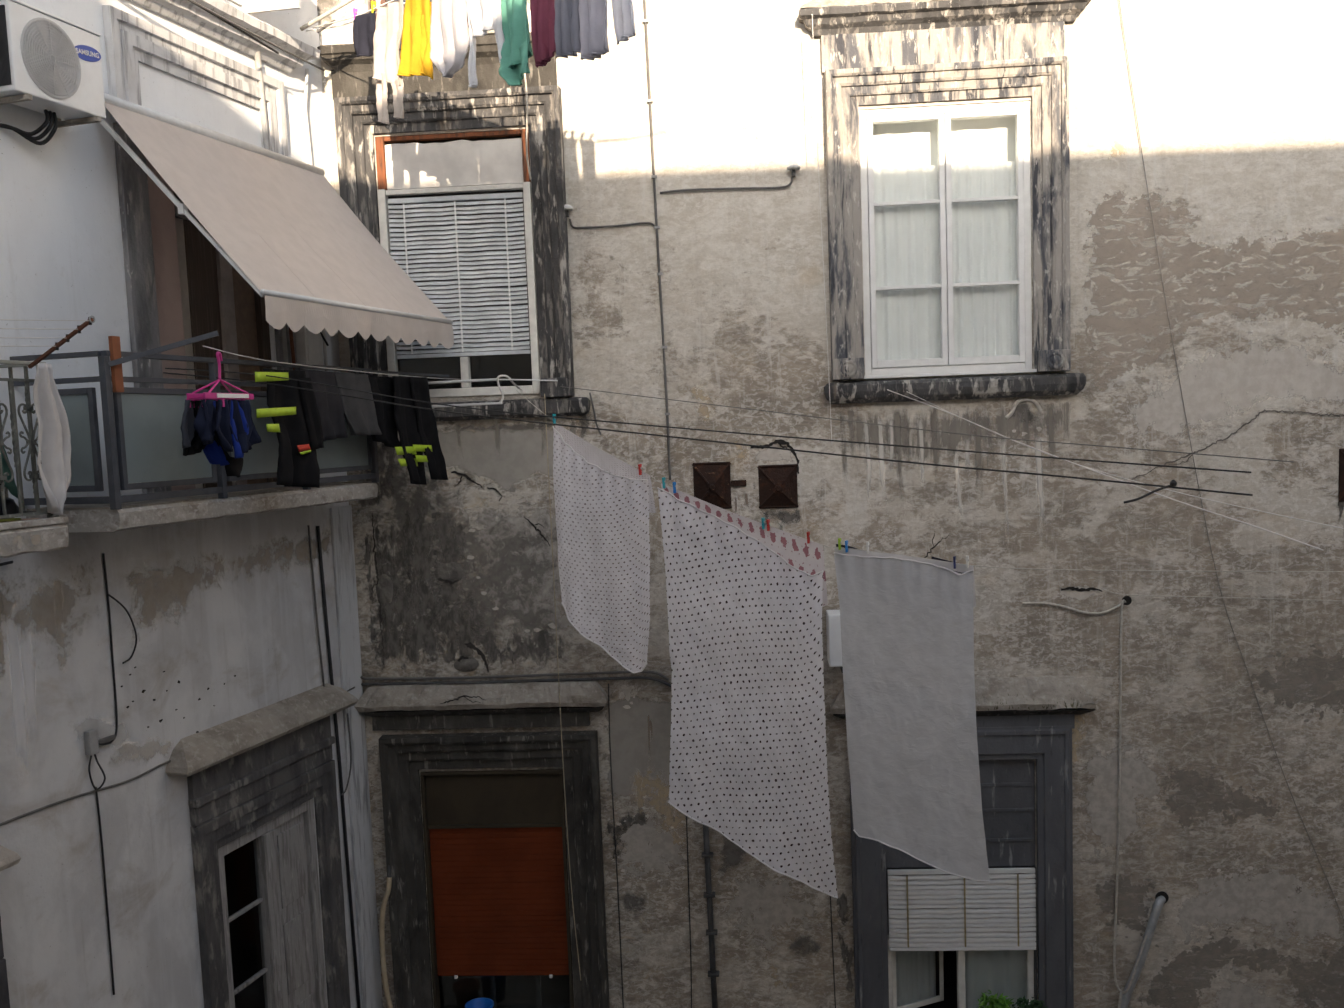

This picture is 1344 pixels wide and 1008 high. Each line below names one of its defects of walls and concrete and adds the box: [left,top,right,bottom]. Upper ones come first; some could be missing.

flaking render [1083,191,1344,446]
peeling [438,421,573,633]
leakage [841,403,1069,508]
crack [1131,409,1344,480]